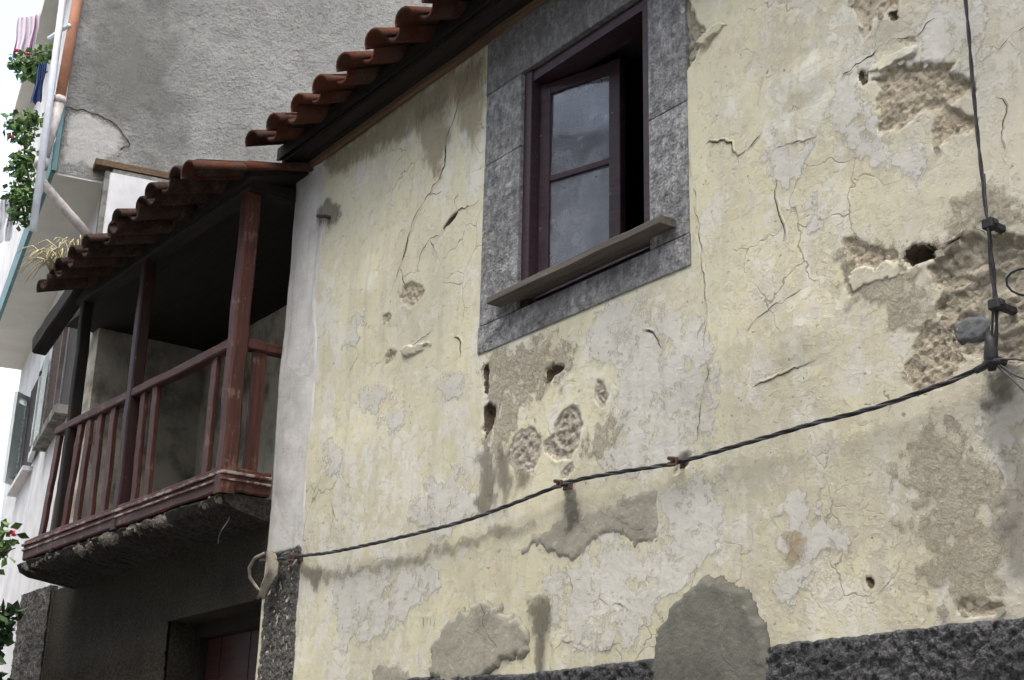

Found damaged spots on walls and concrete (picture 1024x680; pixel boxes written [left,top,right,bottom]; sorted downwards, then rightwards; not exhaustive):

crack [393,63,483,284]
spalling [823,0,991,185]
spalling [21,512,173,573]
spalling [398,282,425,308]
peeling [476,290,725,653]
crack [689,134,817,438]
flaking render [832,179,1024,622]